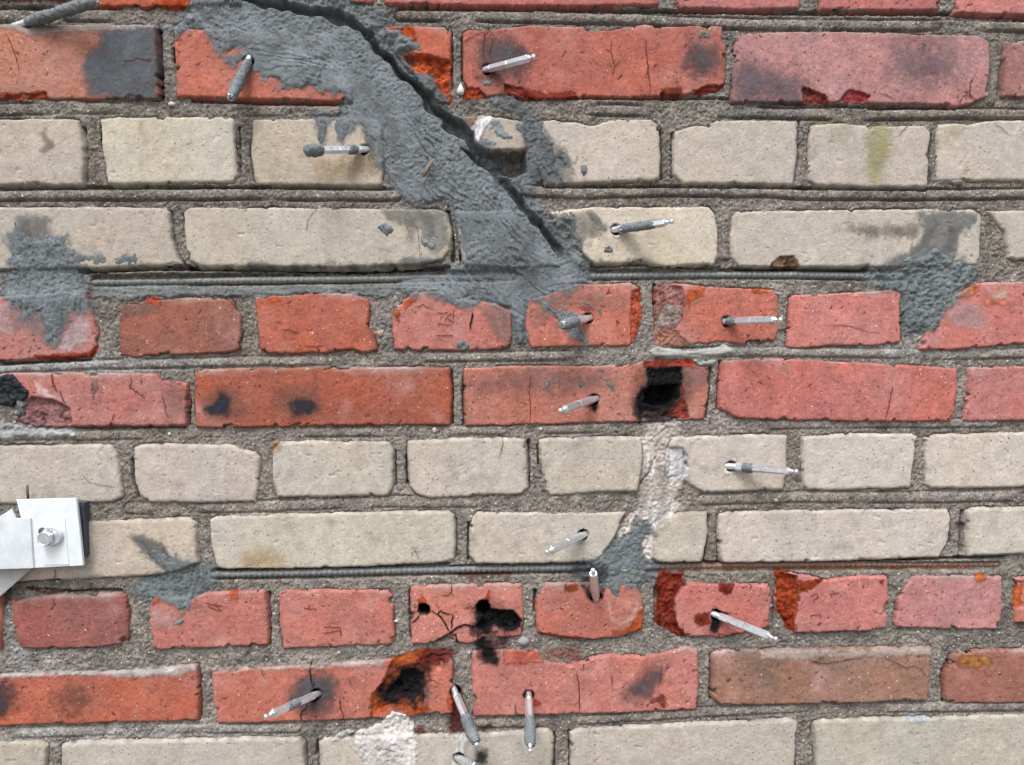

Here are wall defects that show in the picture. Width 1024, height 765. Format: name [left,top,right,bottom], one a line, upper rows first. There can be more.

crack [465,31,494,59]
spalling [643,385,689,419]
damp [617,419,690,559]
crack [411,584,478,644]
spalling [612,569,684,636]
spalling [694,612,711,626]
spalling [719,583,734,595]
spalling [774,568,823,630]
rust [416,646,454,671]
spalling [503,650,541,664]